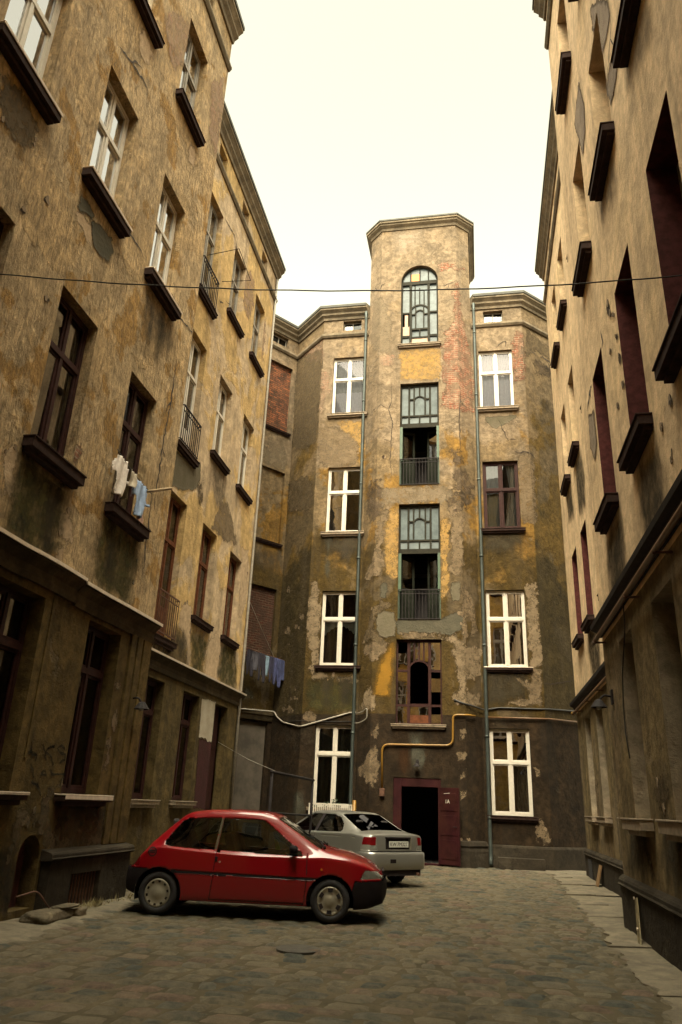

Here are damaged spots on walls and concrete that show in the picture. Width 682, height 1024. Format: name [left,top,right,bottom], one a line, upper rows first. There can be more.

flaking render [76,212,93,247]
flaking render [438,260,475,413]
flaking render [510,330,550,381]
crack [142,362,177,574]
flaking render [283,581,376,711]
flaking render [362,598,394,662]
flaking render [399,500,483,706]
flaking render [508,582,543,707]
flaking render [358,723,381,788]
flaking render [535,818,552,845]